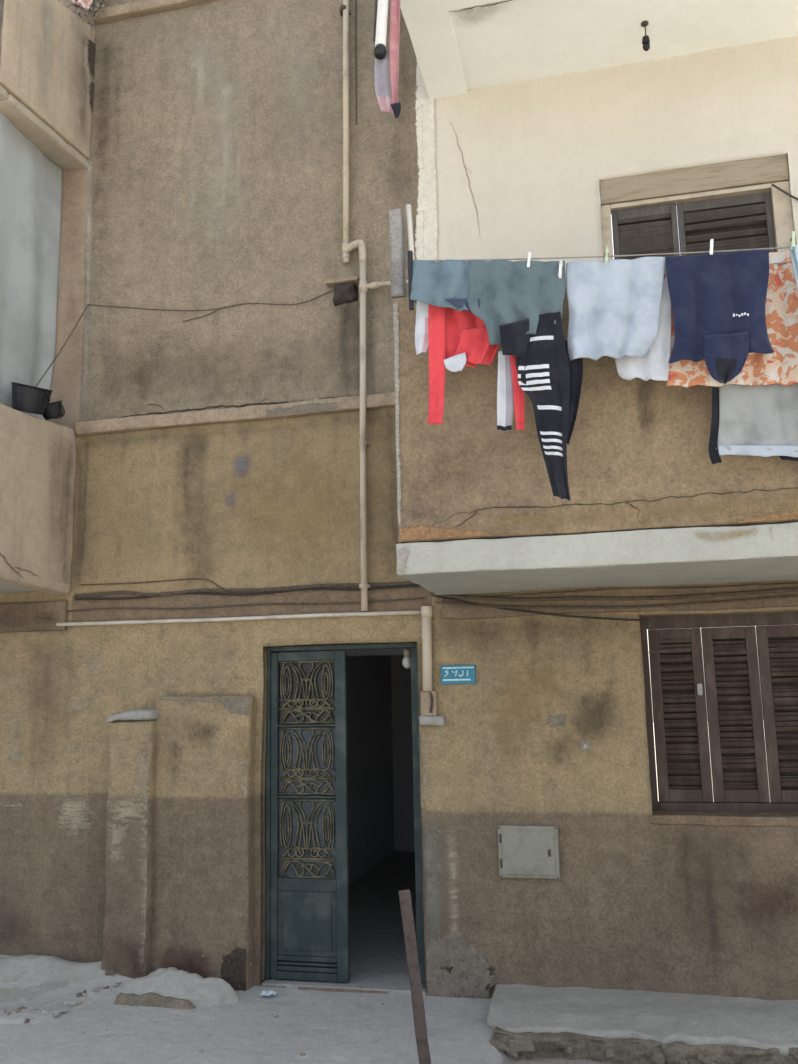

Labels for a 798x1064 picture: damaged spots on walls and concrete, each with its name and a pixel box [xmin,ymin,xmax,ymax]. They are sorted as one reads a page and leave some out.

crack [450,122,480,232]
crack [403,488,792,528]
crack [0,553,40,578]
flaking render [161,946,252,991]